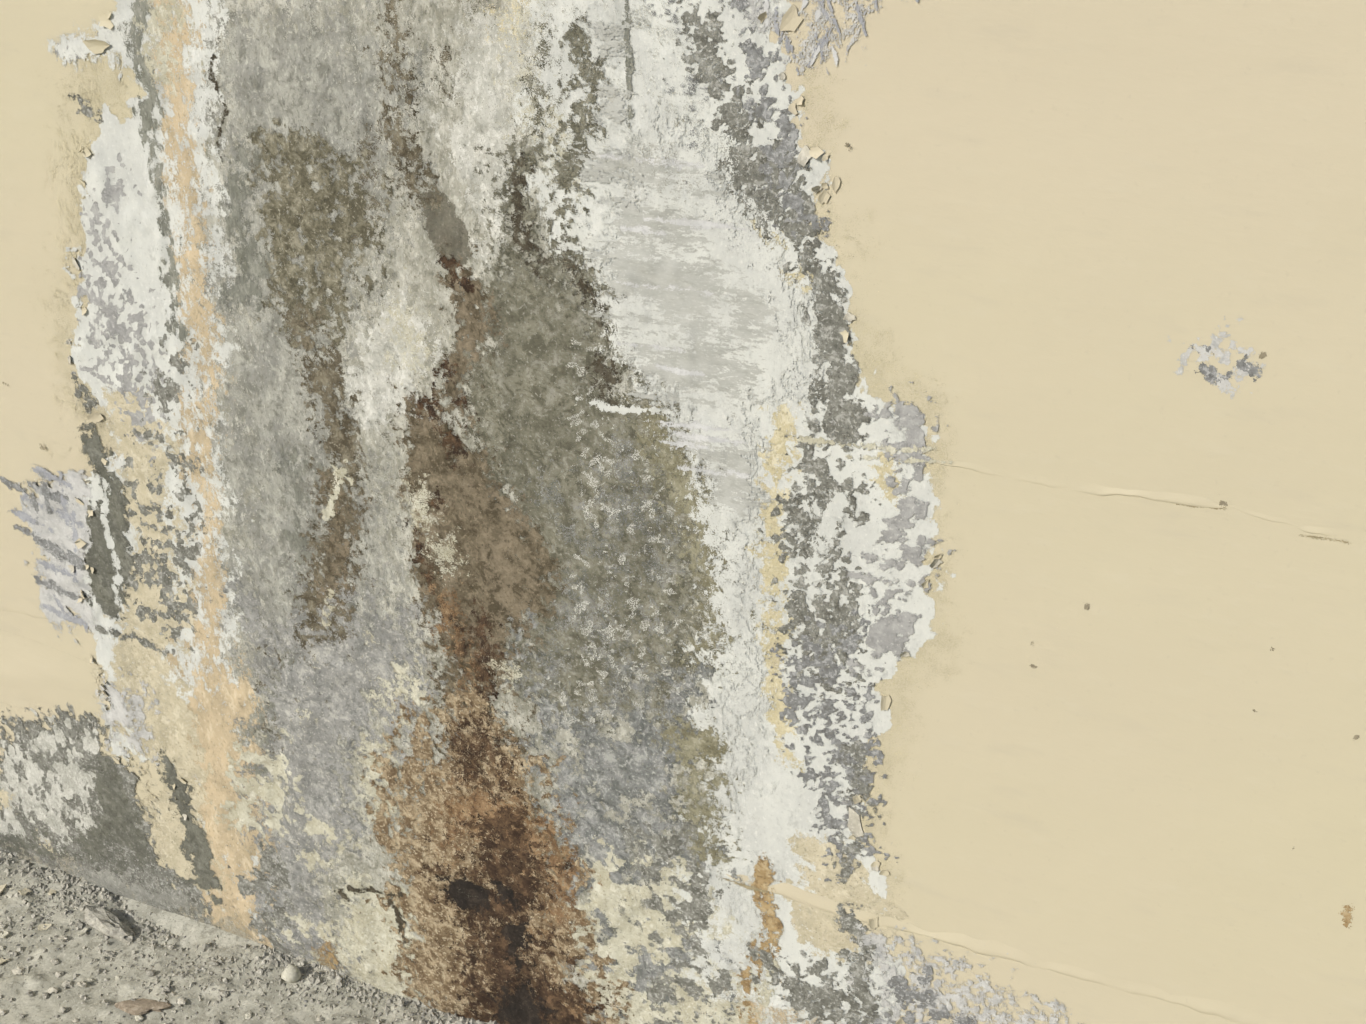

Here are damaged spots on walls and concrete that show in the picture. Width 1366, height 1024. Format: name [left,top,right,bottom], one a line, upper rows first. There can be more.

damp [207,0,468,984]
rust [351,243,635,1024]
peeling [0,0,1079,1024]
damp [438,0,806,1024]
peeling [1168,316,1266,400]